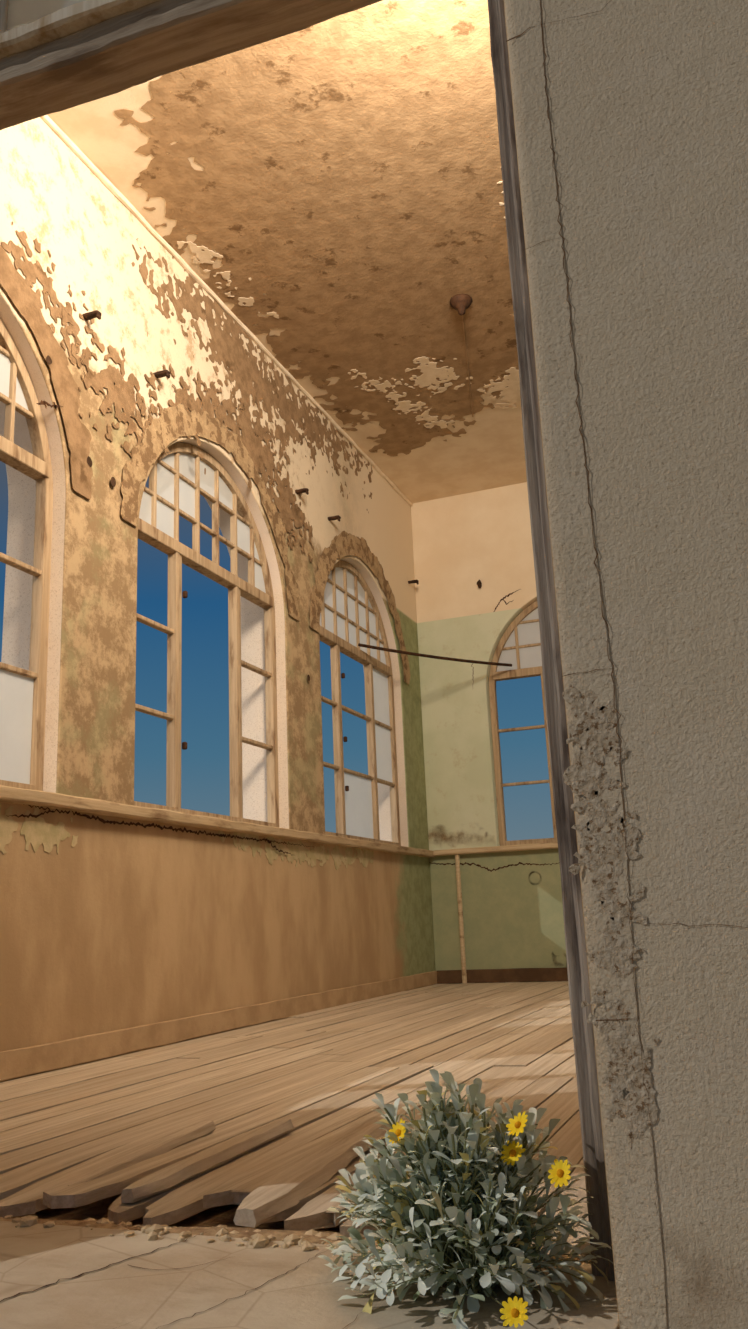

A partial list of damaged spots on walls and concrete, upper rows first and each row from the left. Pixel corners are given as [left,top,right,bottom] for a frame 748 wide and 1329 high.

peeling [0,0,521,684]
crack [6,805,314,855]
spalling [562,681,659,1151]
crack [506,0,748,1316]
crack [0,1232,227,1302]